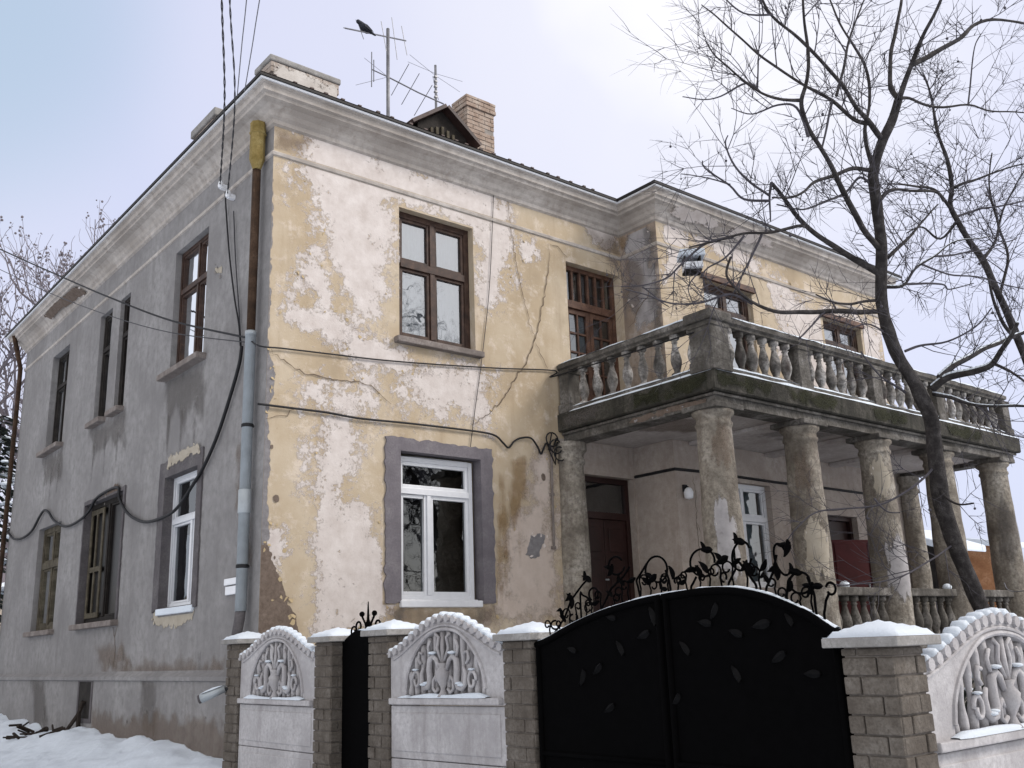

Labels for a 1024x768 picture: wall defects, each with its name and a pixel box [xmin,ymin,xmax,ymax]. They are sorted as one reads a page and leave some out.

crack [272,353,391,404]
peeling [259,132,541,635]
crack [472,231,567,425]
peeling [714,498,742,581]